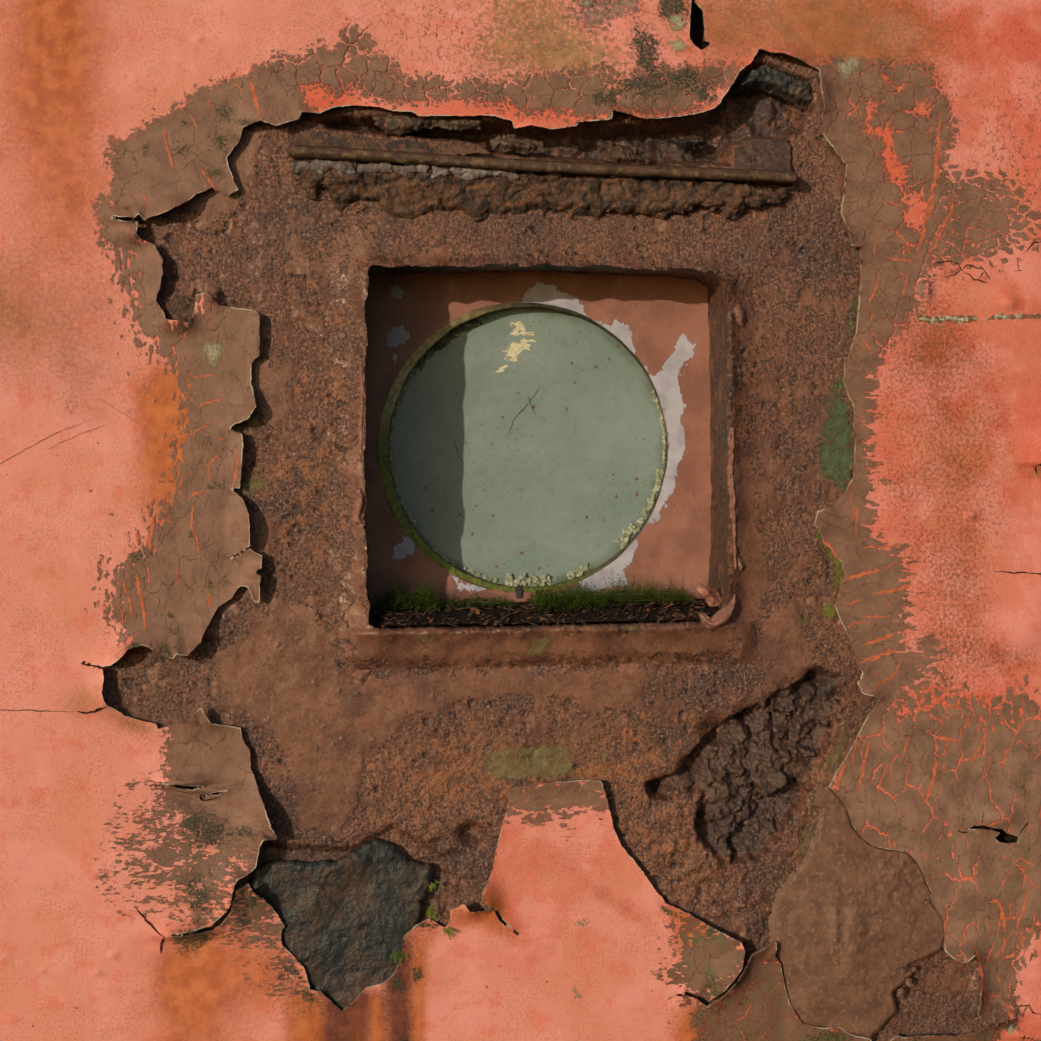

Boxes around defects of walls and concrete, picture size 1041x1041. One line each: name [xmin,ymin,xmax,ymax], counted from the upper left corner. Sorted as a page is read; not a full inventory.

corrosion [15,0,92,213]
water stain [592,0,719,106]
crack [920,261,990,286]
peeling [76,17,747,717]
corrosion [139,370,204,512]
peeling [651,47,1041,1041]
crack [77,706,106,714]
water stain [173,869,218,956]
peeling [96,707,332,1020]
water stain [179,810,255,852]
crack [842,802,942,918]
corrosion [288,938,423,1041]